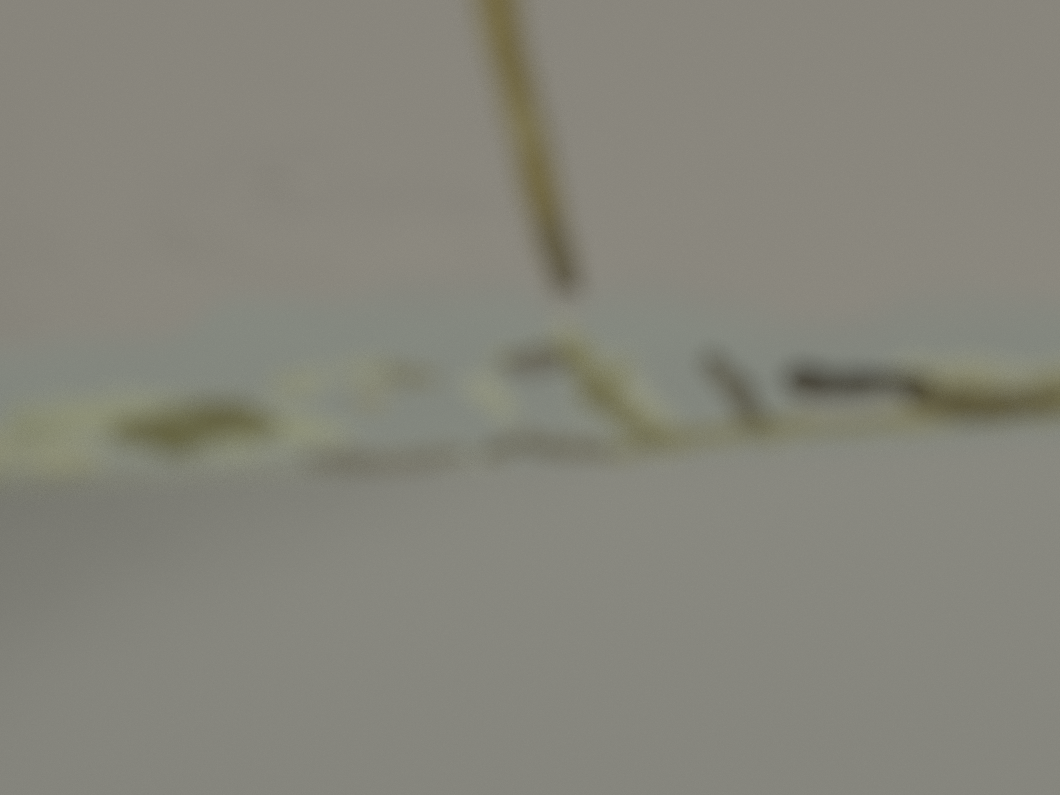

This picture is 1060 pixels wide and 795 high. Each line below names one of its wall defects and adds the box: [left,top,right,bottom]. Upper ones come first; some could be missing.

crack [478,0,580,299]
leakage [12,401,343,455]
crack [560,325,677,454]
spalling [702,353,772,436]
spalling [783,367,930,401]